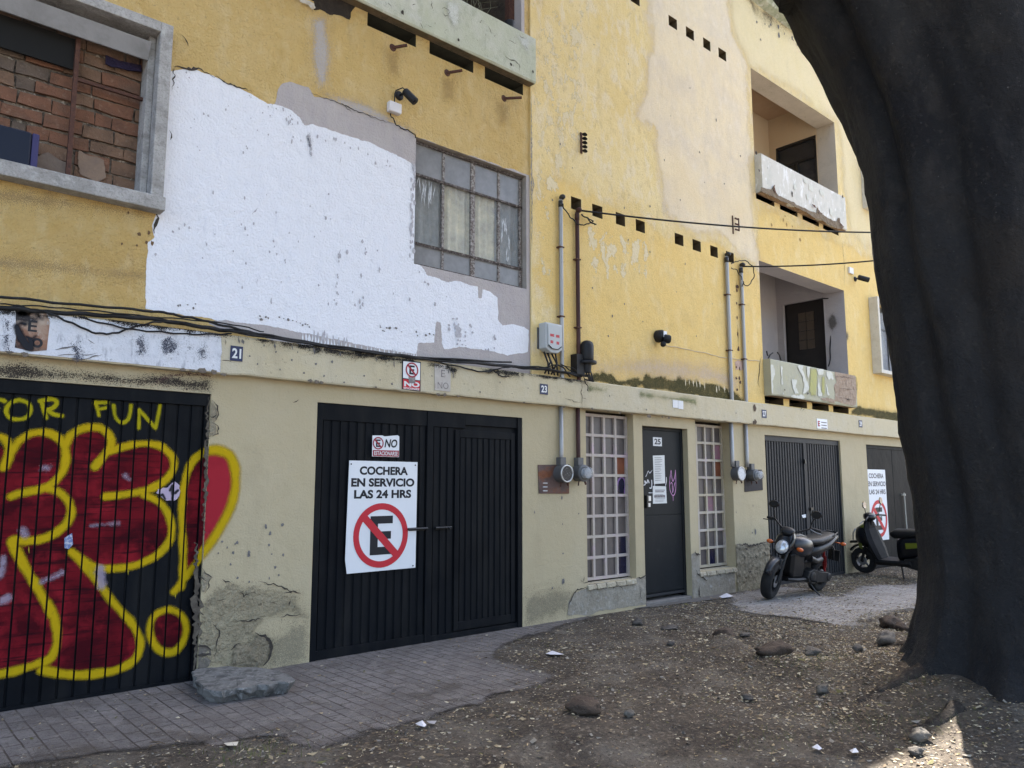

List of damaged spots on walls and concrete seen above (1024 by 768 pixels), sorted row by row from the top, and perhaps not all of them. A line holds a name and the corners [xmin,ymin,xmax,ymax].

peeling [262,104,390,167]
flaking render [761,178,843,229]
peeling [448,318,474,346]
flaking render [180,368,227,376]
leakage [485,349,743,406]
flaking render [771,364,856,406]
flaking render [209,400,219,436]
flaking render [691,530,771,599]
flaking render [197,523,310,669]
flaking render [567,576,646,616]